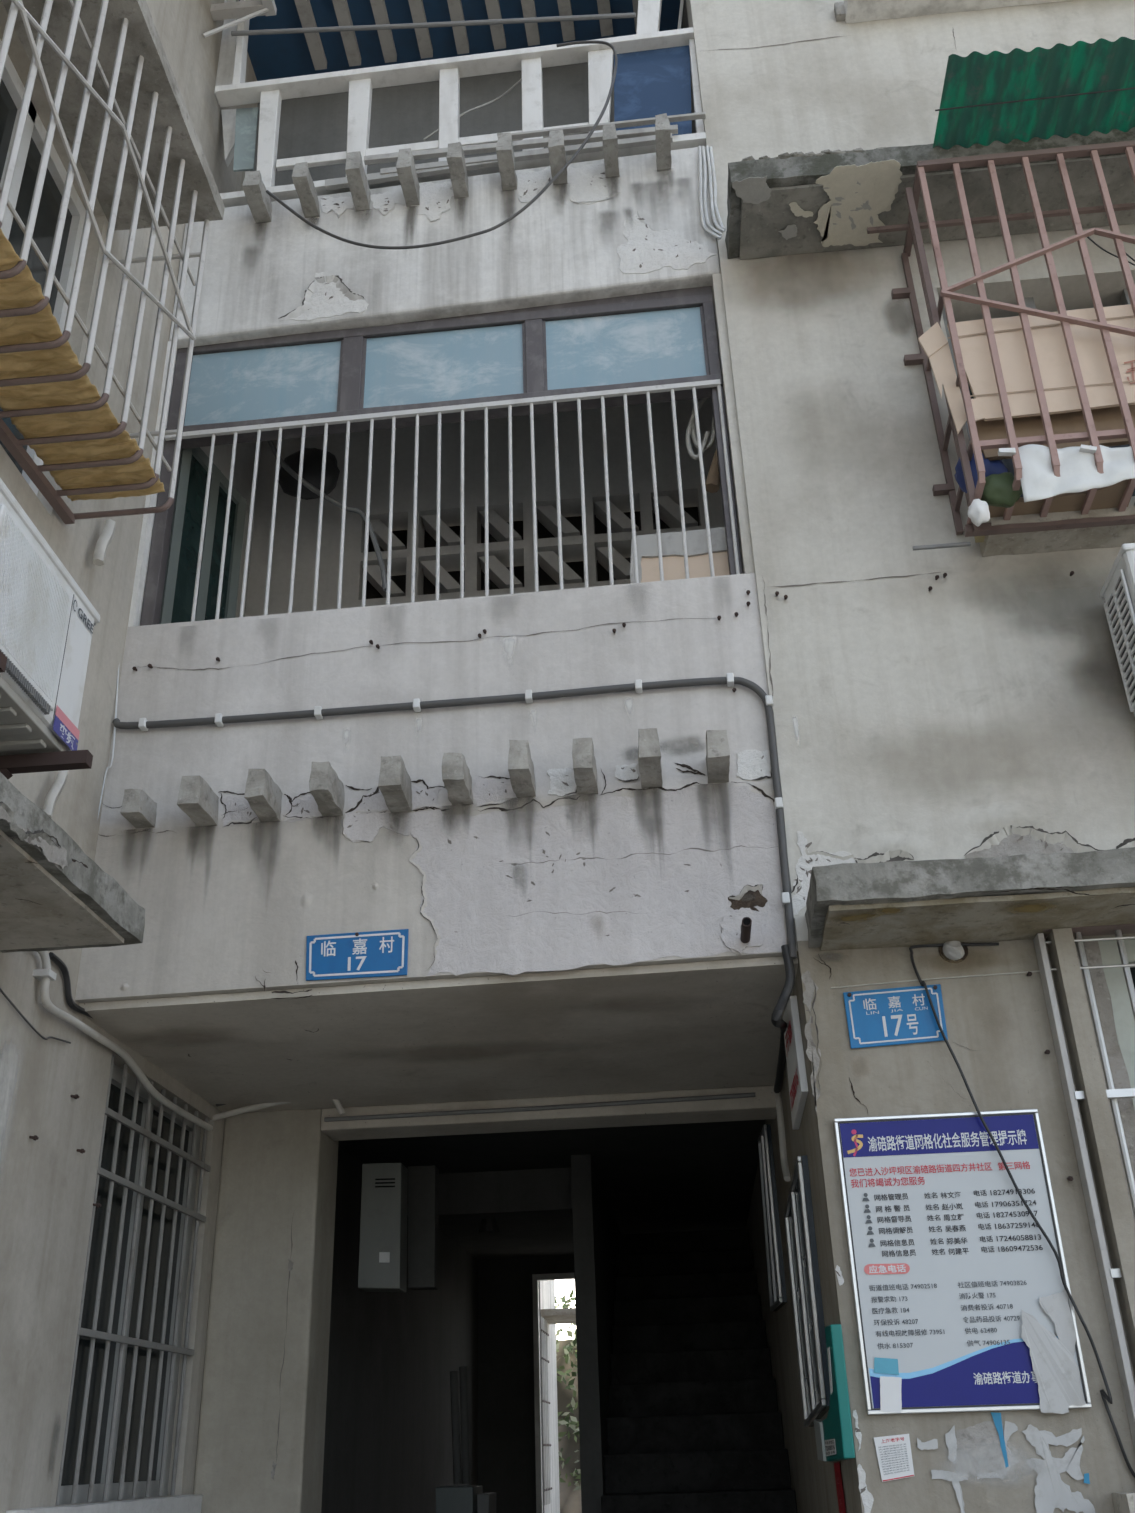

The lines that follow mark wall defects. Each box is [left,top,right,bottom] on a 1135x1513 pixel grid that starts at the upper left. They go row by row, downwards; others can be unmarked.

peeling [732,176,772,204]
peeling [778,160,902,247]
spalling [278,272,369,322]
crack [220,791,245,817]
crack [284,763,775,818]
flaking render [342,749,914,978]
crack [497,845,779,865]
spalling [964,825,1135,859]